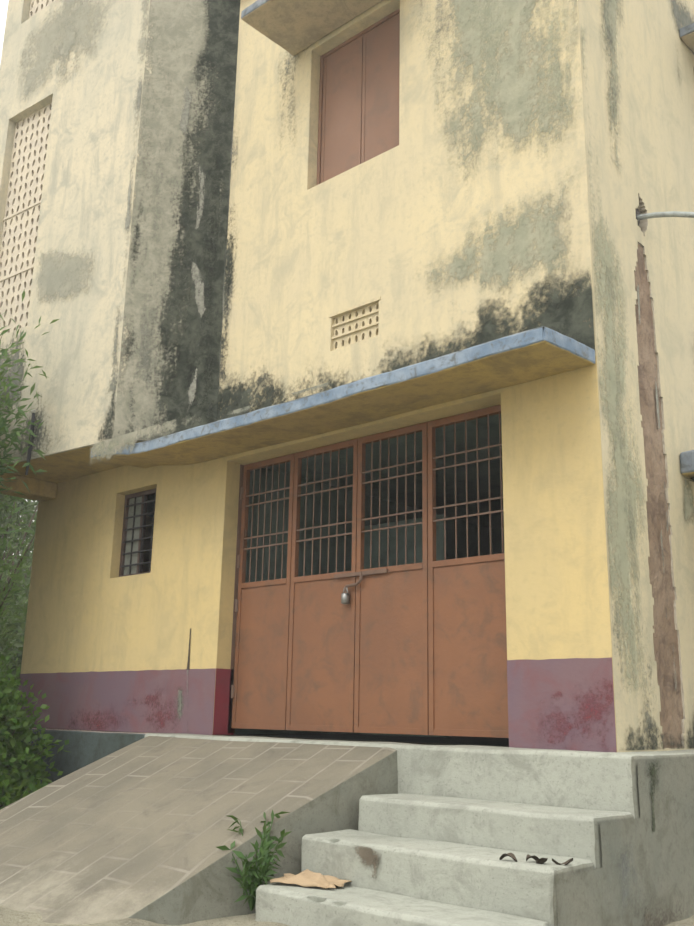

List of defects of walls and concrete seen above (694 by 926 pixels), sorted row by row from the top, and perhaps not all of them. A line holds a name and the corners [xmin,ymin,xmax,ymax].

damp [21,0,103,95]
damp [37,250,92,300]
damp [90,0,345,460]
damp [380,273,595,373]
flaking render [634,193,685,748]
damp [626,704,694,750]